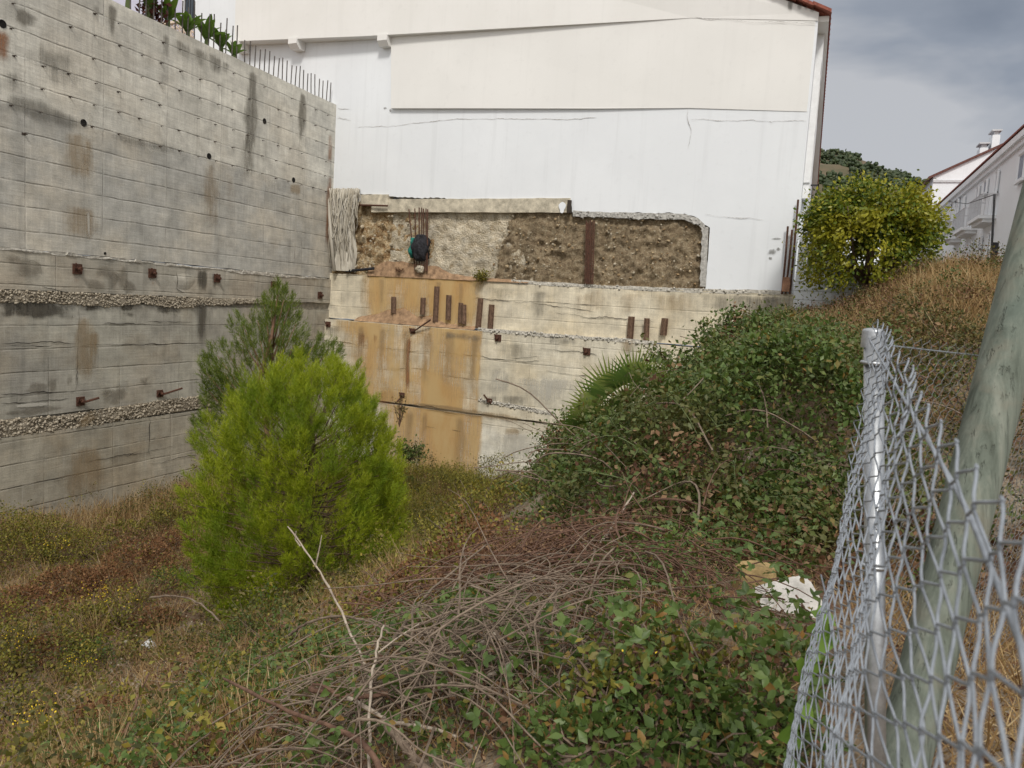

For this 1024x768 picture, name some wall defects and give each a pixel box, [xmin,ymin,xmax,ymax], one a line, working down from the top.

leakage [246,75,256,153]
spalling [408,208,431,271]
spalling [511,200,799,295]
corrosion [341,276,482,476]